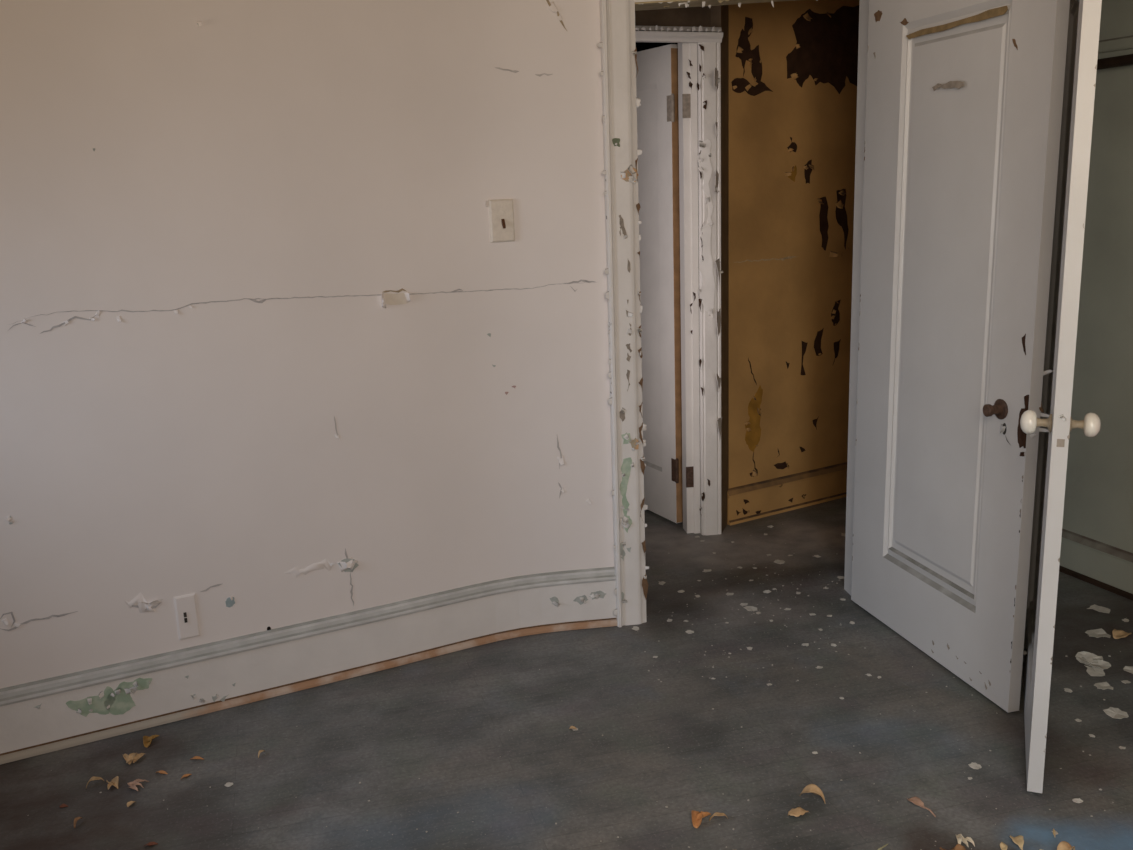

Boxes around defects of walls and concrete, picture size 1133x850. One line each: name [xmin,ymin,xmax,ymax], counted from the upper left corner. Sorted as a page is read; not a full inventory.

peeling [635,25,722,51]
peeling [660,0,773,109]
peeling [786,0,859,94]
peeling [932,81,964,91]
peeling [621,149,642,184]
peeling [785,137,816,184]
peeling [817,189,852,259]
crack [409,280,595,295]
crack [9,294,382,334]
peeling [786,299,841,375]
peeling [611,402,649,599]
peeling [66,678,152,717]